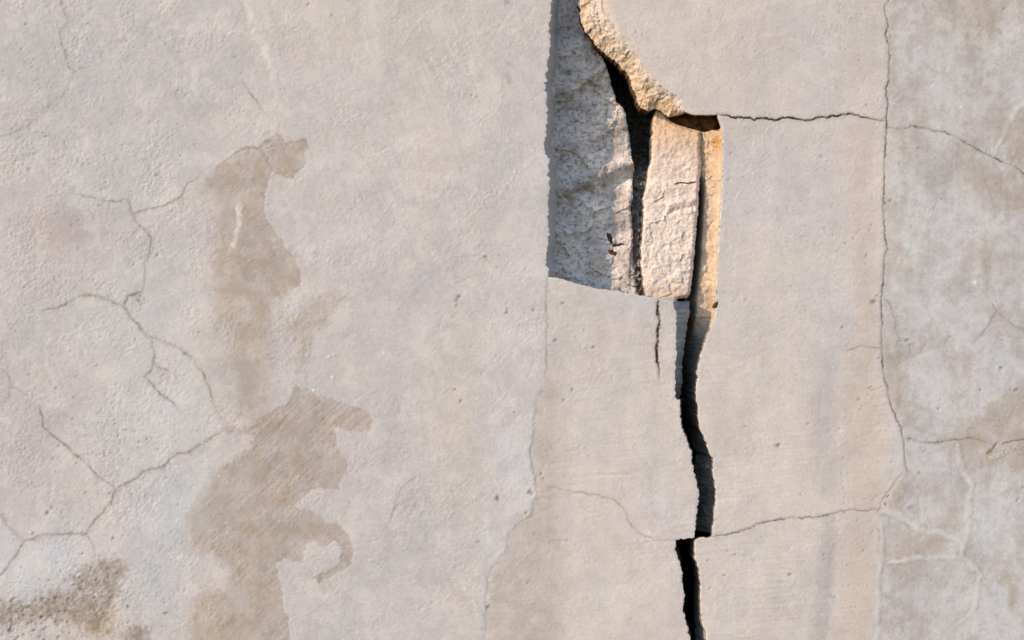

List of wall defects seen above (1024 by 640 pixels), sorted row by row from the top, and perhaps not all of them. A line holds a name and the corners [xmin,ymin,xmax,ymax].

crack [0,177,225,578]
leakage [184,131,310,448]
spalling [543,0,722,317]
crack [547,0,1024,640]
leakage [178,584,234,640]